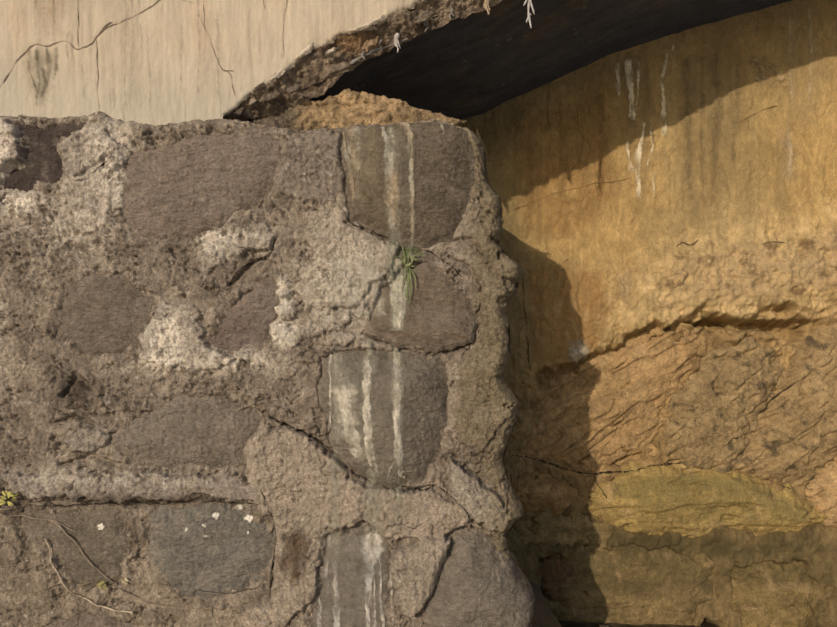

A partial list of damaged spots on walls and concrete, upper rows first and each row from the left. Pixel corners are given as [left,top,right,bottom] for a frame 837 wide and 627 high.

crack [0,0,160,111]
crack [184,0,235,94]
spalling [226,0,502,121]
damp [615,59,654,195]
damp [660,45,674,132]
damp [333,122,420,332]
damp [328,340,378,506]
damp [389,346,405,497]
crack [509,454,683,499]
damp [317,517,394,627]